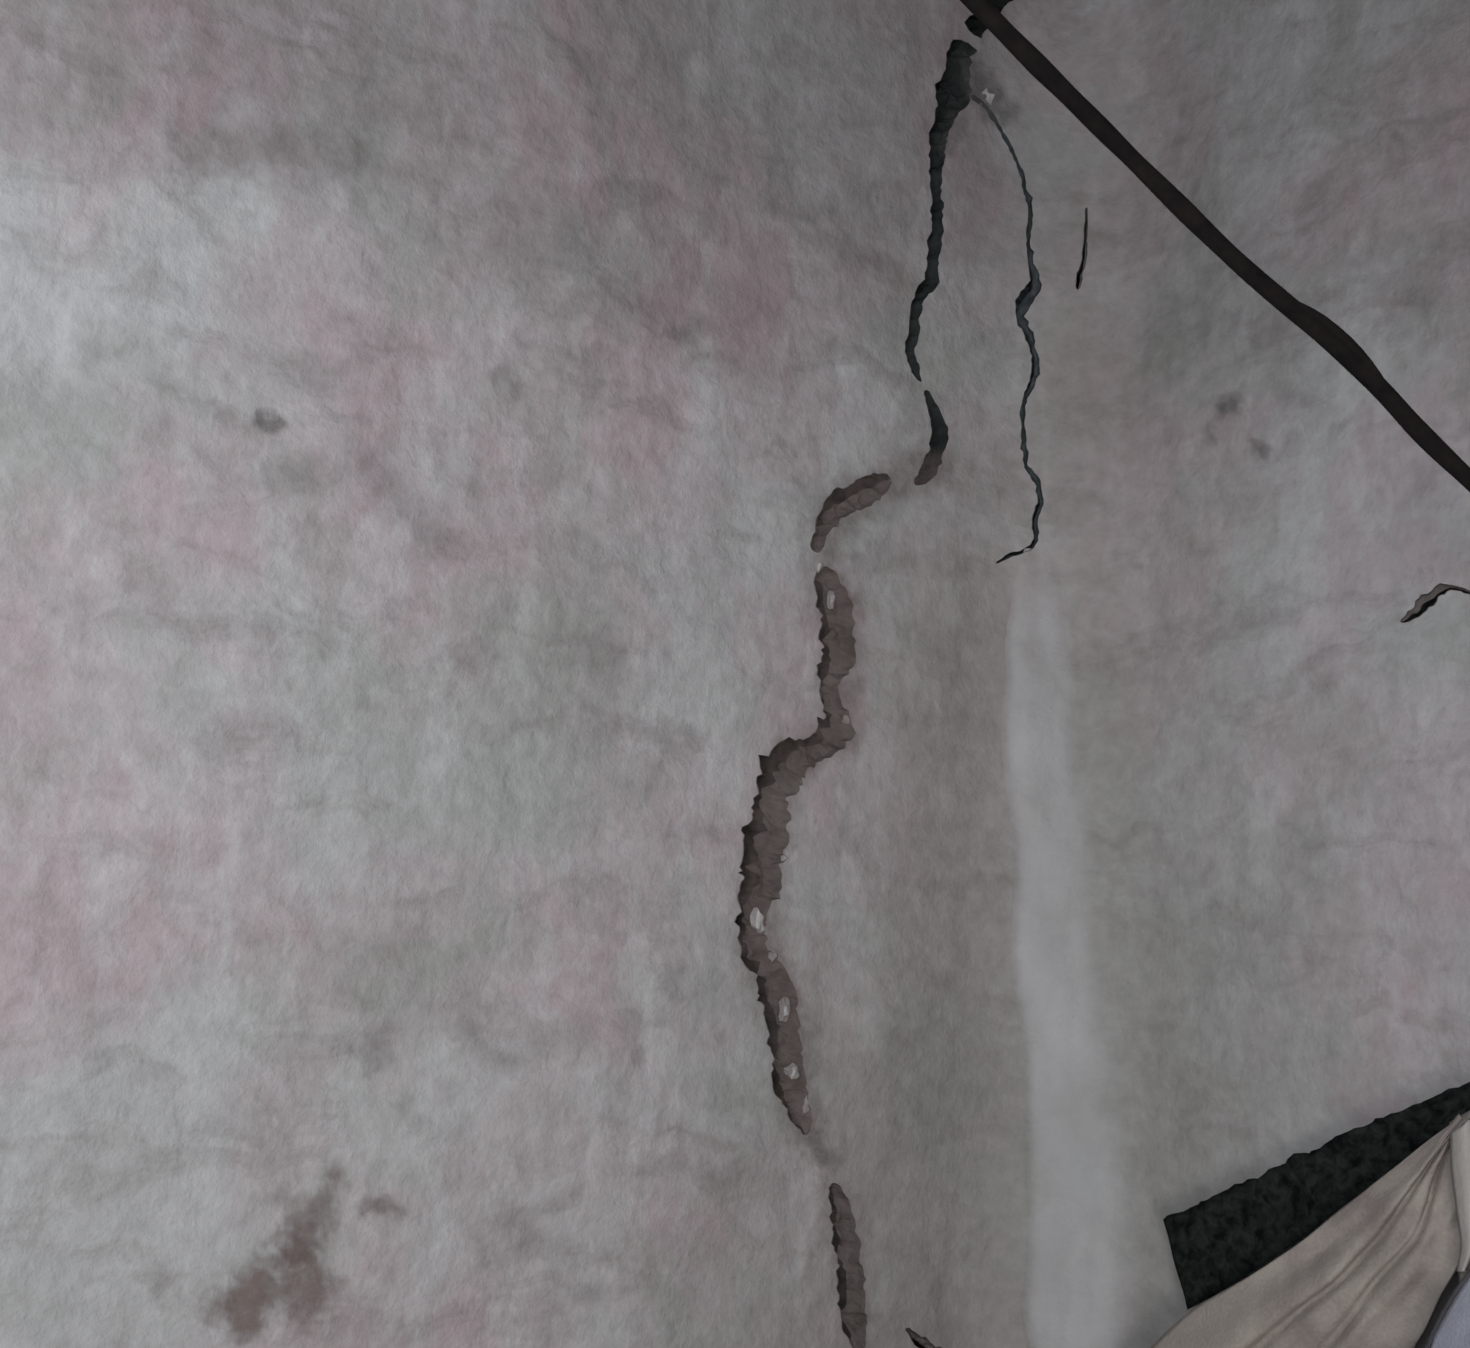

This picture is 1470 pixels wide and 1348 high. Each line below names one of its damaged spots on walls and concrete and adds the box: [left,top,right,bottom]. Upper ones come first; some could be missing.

crack [734,0,1088,1135]
crack [828,1183,867,1348]
crack [905,1328,942,1348]